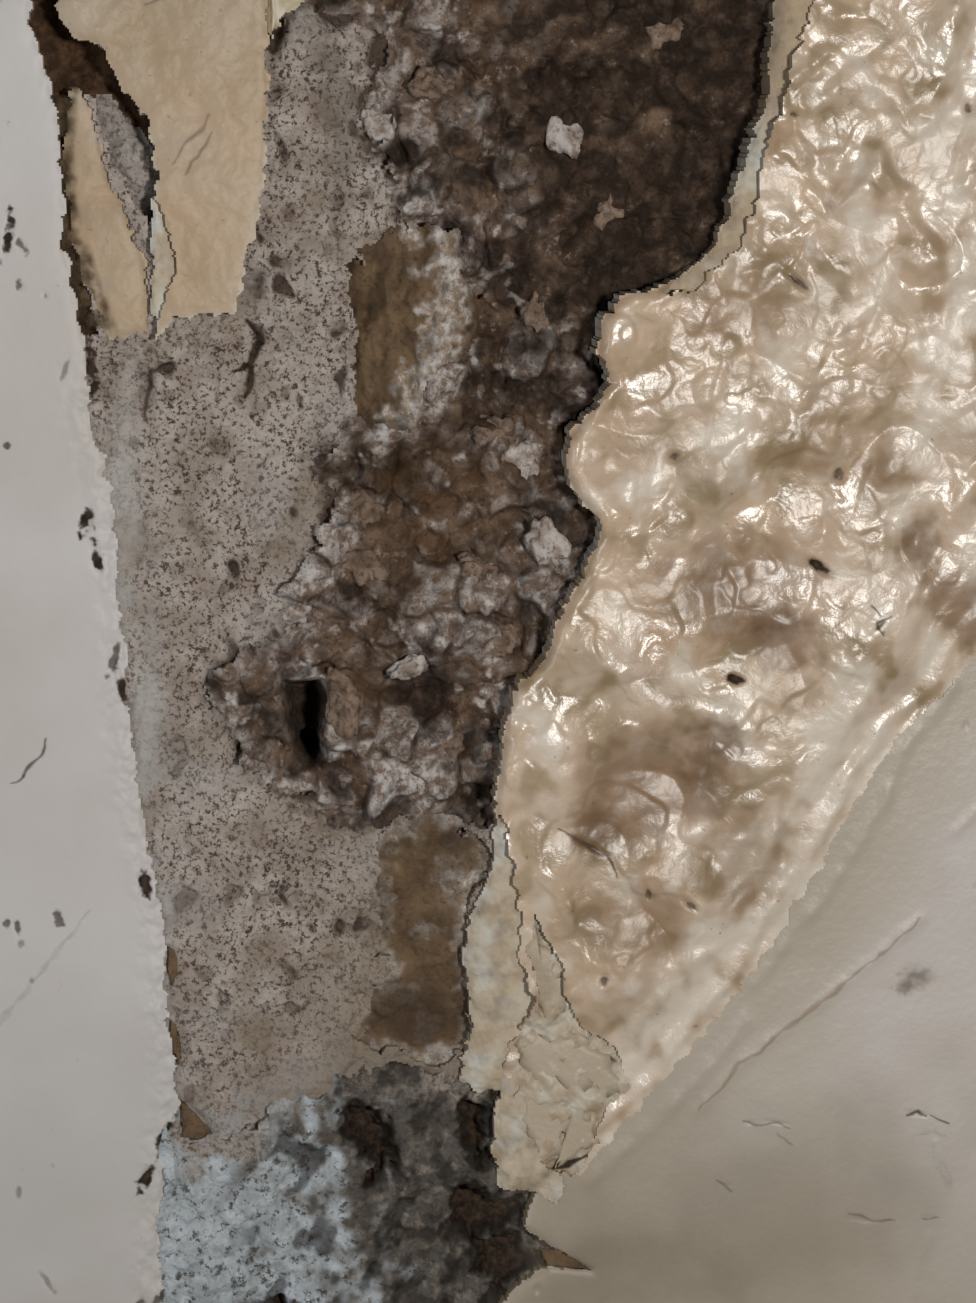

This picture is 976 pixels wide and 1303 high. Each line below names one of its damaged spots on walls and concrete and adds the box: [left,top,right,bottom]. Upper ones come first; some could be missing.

flaking render [54,0,814,1303]